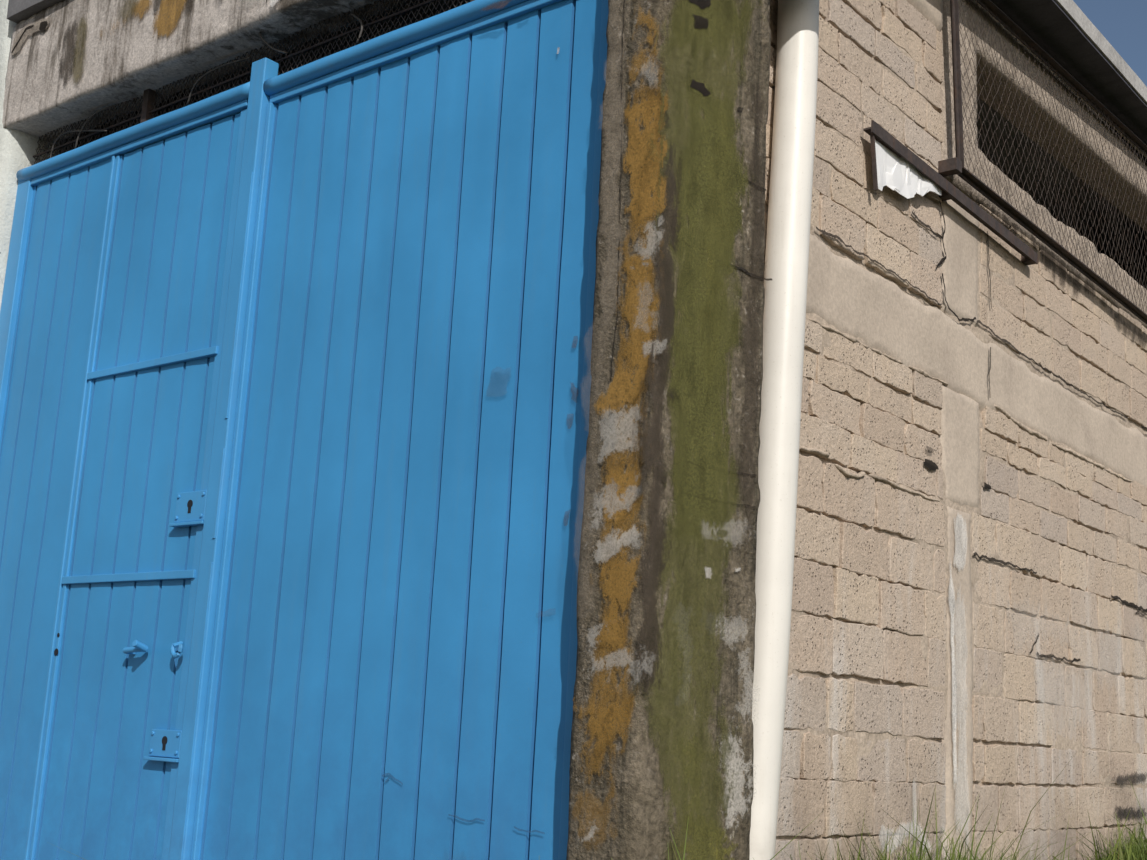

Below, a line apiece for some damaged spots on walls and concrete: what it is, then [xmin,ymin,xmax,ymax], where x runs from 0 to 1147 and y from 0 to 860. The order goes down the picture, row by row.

damp [58,18,86,86]
spalling [690,79,711,96]
crack [816,202,1147,429]
peeling [573,7,669,790]
damp [635,82,764,708]
crack [974,552,1037,574]
crack [1111,595,1147,616]
crack [1030,634,1081,663]
damp [720,732,753,826]
damp [1117,772,1147,787]
damp [1115,807,1146,822]